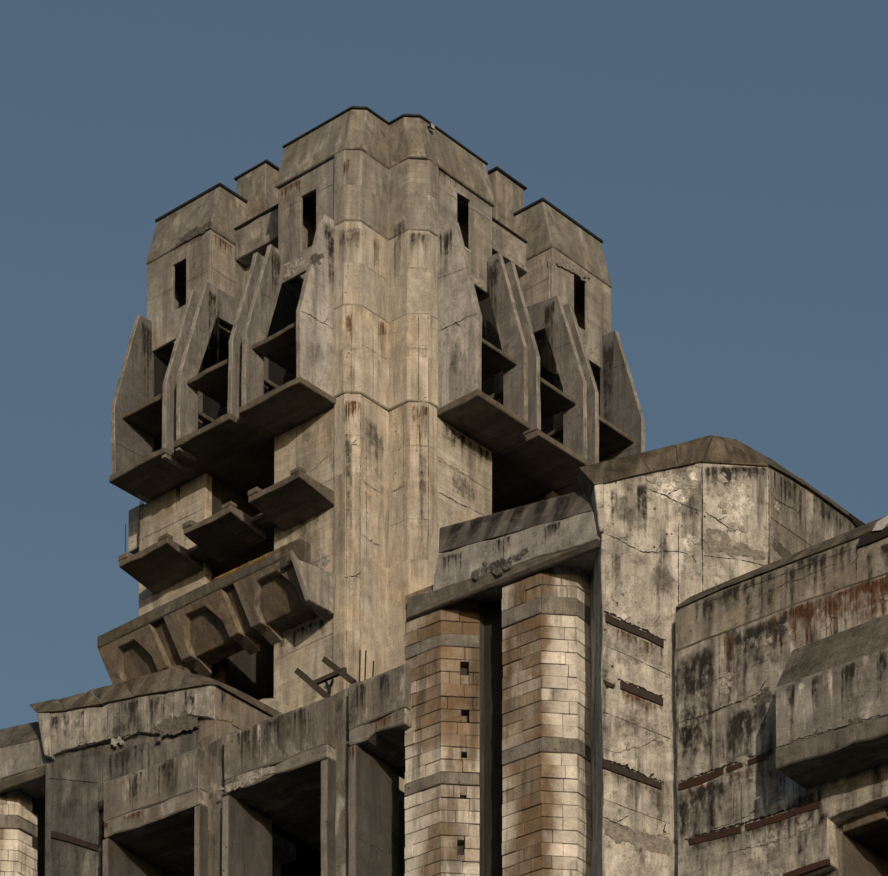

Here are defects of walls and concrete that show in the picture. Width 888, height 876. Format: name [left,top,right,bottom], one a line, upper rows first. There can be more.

damp [324,225,345,277]
crack [646,488,740,533]
spalling [471,547,529,581]
crack [603,533,699,562]
rust [771,574,888,645]
damp [728,615,786,672]
spalling [152,709,200,742]
damp [675,650,714,751]
damp [727,703,766,782]
spalling [219,766,276,792]
damp [678,783,731,834]
spalling [604,820,678,856]